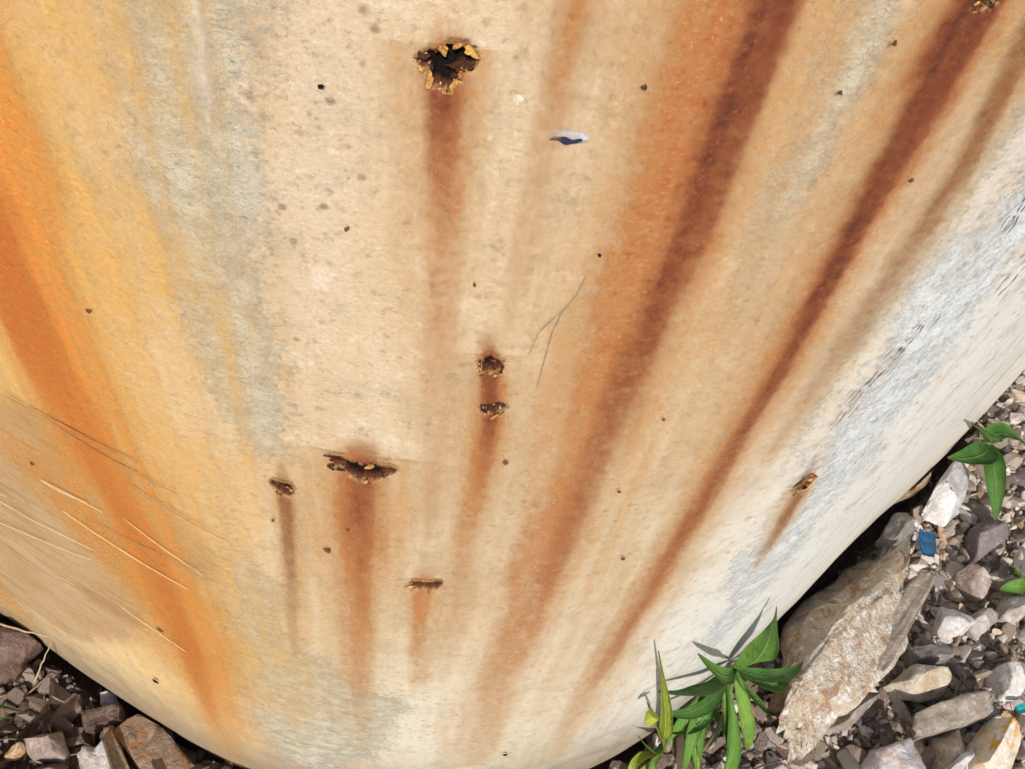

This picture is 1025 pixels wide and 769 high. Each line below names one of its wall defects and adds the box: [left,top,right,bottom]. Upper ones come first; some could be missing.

rust [396,48,490,233]
rust [0,0,302,725]
rust [453,349,513,531]
rust [494,0,856,679]
rust [599,0,1025,669]
rust [314,447,413,674]
rust [406,575,444,649]